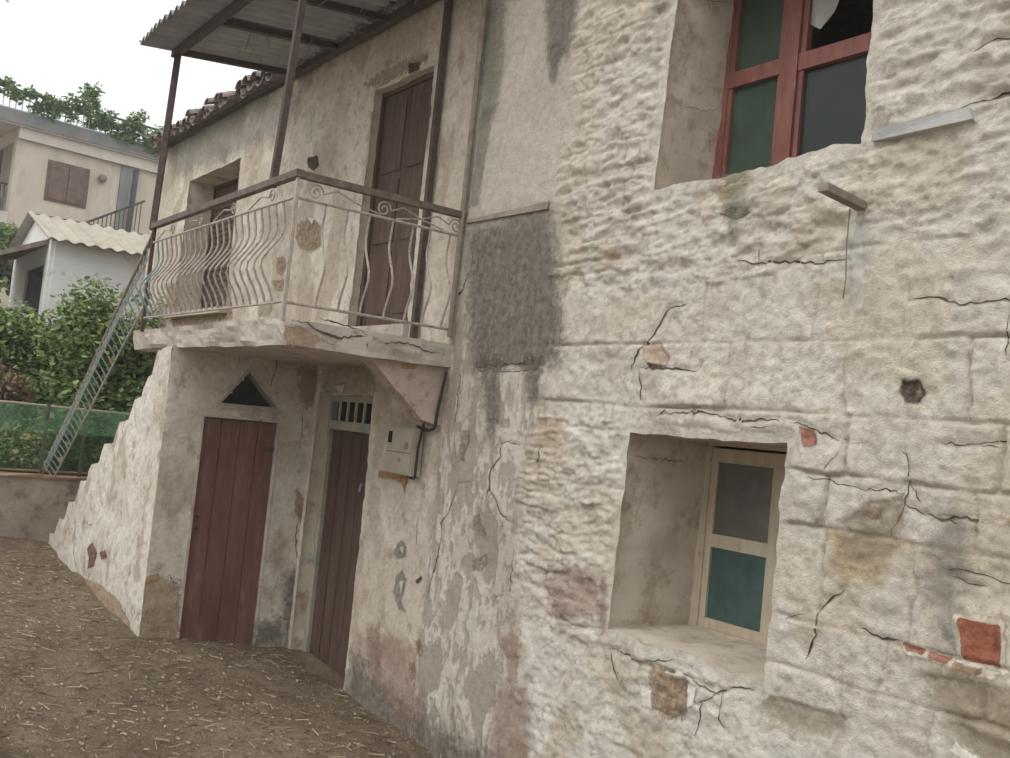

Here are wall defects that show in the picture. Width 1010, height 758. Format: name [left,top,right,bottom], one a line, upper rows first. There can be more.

crack [297,318,441,354]
leakage [467,213,563,431]
crack [631,304,703,399]
crack [911,296,1010,356]
crack [656,410,979,534]
crack [940,440,1007,448]
peeling [394,541,406,558]
crack [416,441,542,598]
peeling [85,543,181,639]
peeling [393,570,422,613]
spalling [900,612,1010,681]
spalling [947,742,980,758]